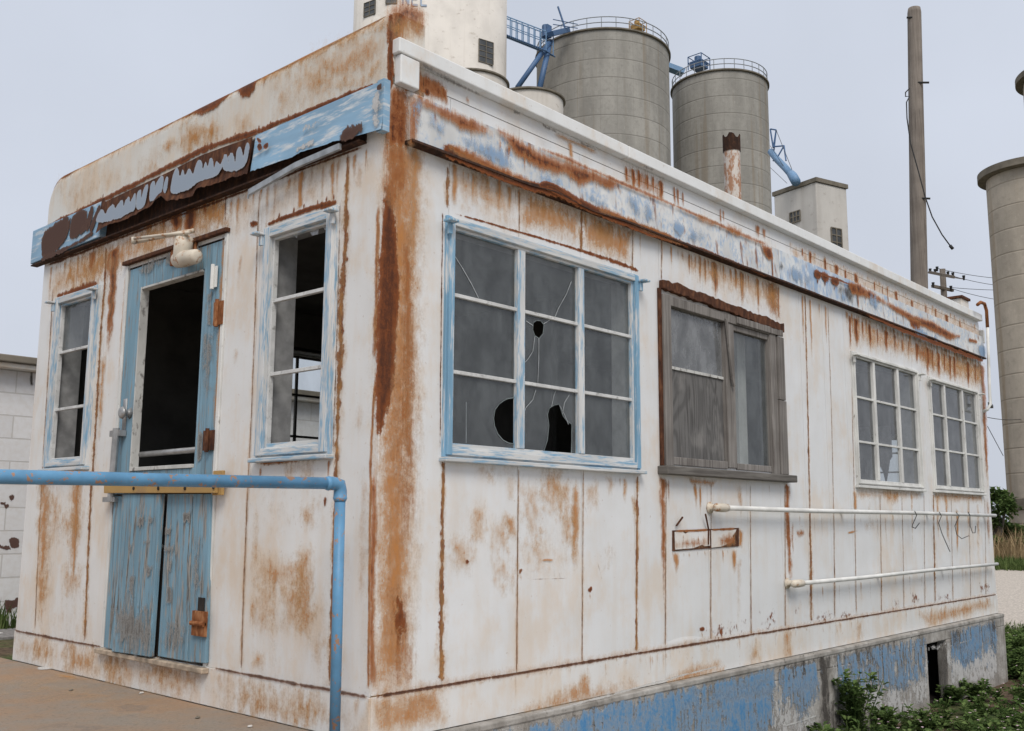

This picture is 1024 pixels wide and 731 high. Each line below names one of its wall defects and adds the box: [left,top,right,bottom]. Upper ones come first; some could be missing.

peeling [41,138,268,261]
rust [49,0,487,691]
peeling [340,83,382,142]
rust [440,129,779,435]
rust [16,485,100,677]
peeling [500,662,820,731]
rust [378,372,996,729]
peeling [832,621,998,715]